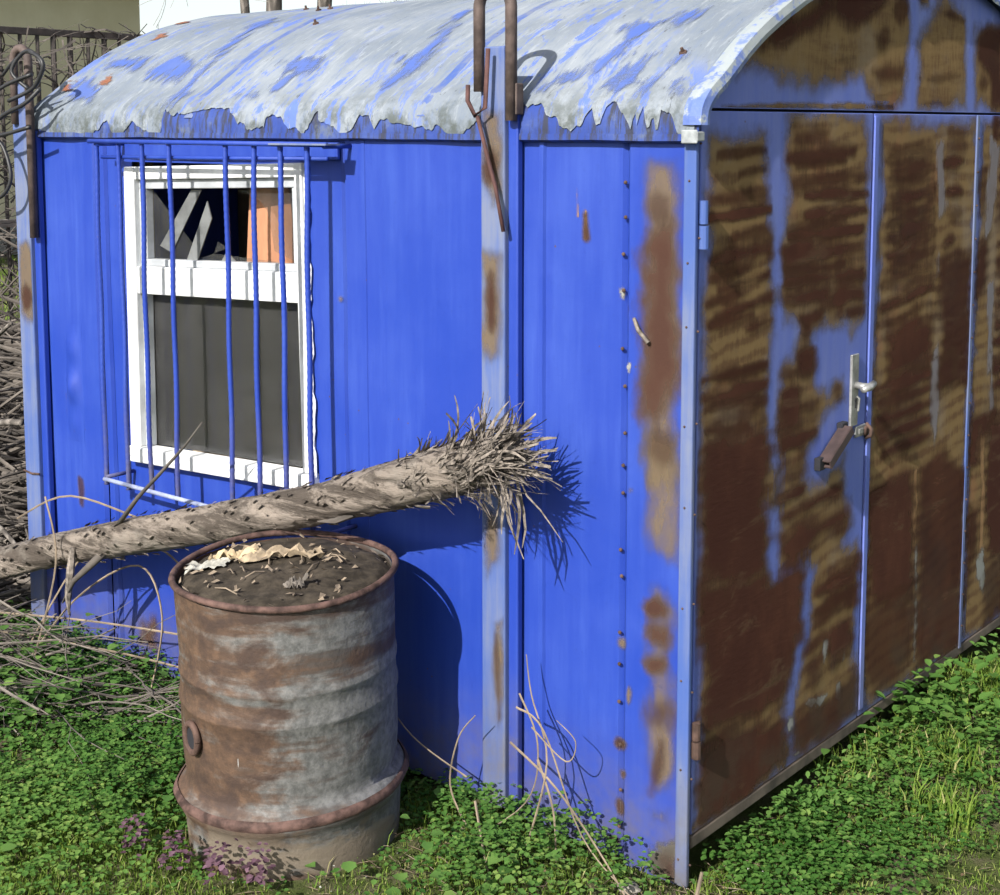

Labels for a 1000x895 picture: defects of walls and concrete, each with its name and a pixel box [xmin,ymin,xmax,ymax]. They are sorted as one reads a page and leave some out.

peeling [34,0,505,134]
peeling [517,0,777,134]
rust [482,112,502,199]
rust [481,252,500,359]
rust [637,163,682,557]
rust [692,0,1000,834]
rust [643,593,673,784]